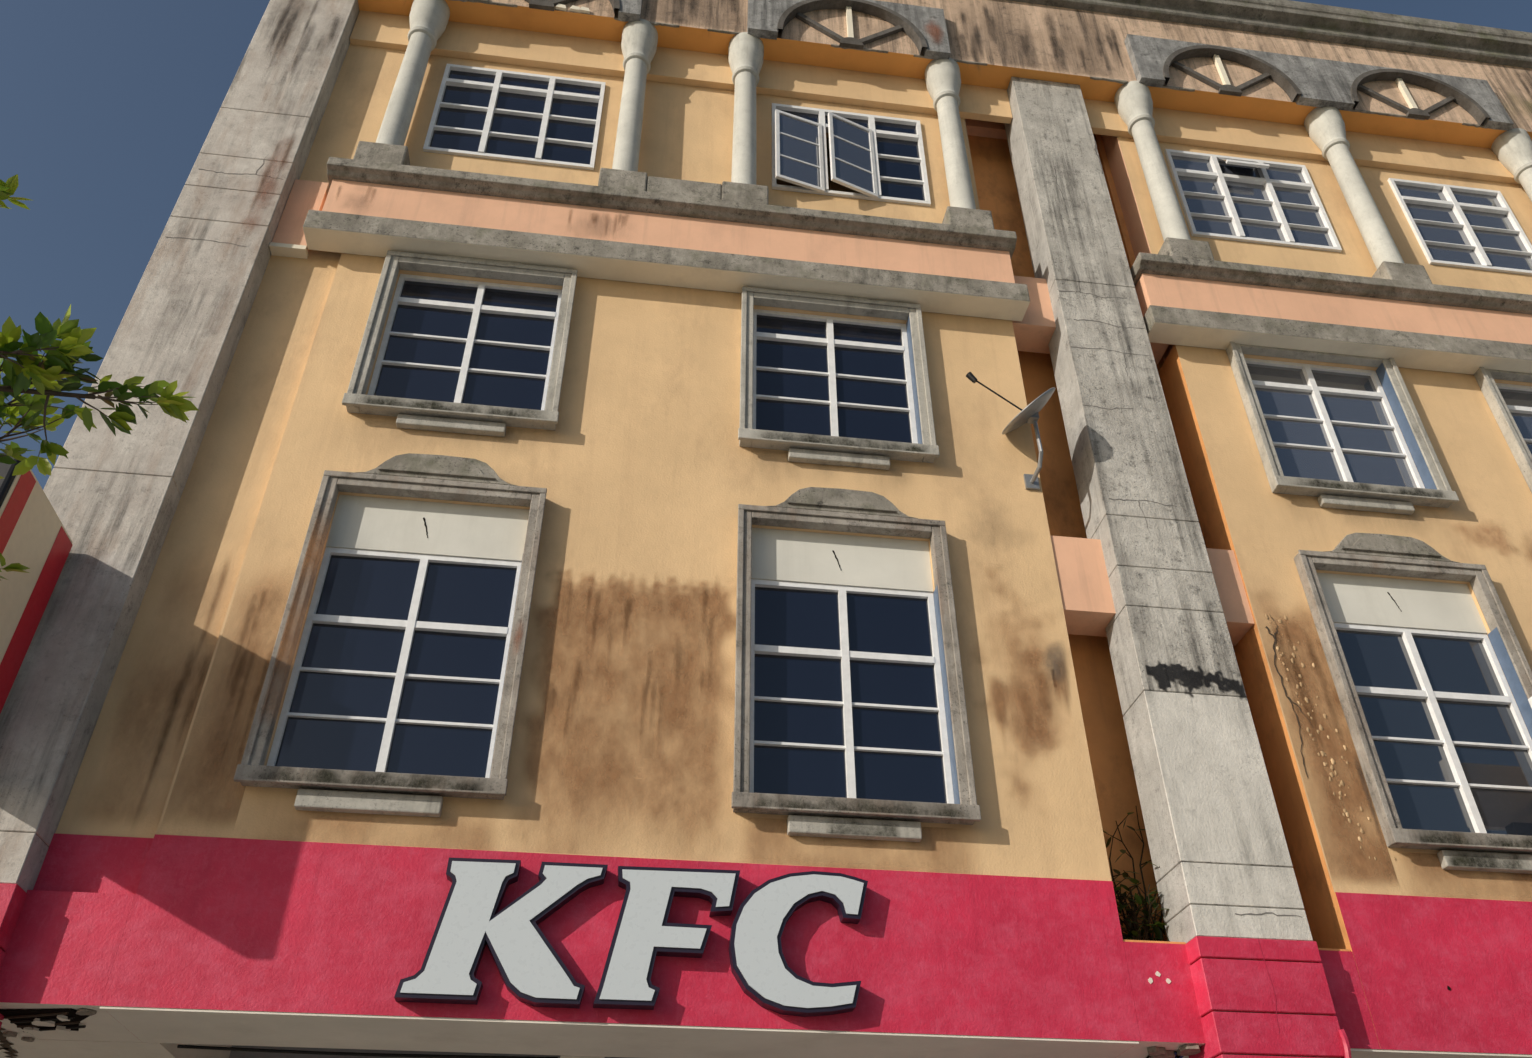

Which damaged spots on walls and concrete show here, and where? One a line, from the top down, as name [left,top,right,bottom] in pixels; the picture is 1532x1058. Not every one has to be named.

water stain [532,577,734,813]
water stain [997,650,1067,748]
peeling [1145,662,1246,698]
crack [1265,614,1314,777]
crack [0,1028,18,1058]